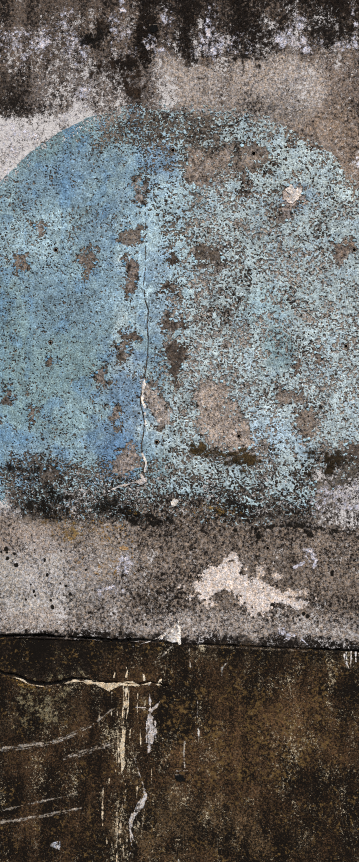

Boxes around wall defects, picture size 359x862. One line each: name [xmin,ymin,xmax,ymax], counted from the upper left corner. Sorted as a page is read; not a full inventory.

water stain [1,0,359,124]
peeling [185,139,272,194]
peeling [75,247,98,275]
peeling [118,224,145,295]
peeling [193,378,257,453]
water stain [3,462,73,520]
water stain [88,453,197,532]
water stain [223,455,258,474]
water stain [306,448,358,498]
spalling [177,549,317,619]
crack [0,632,359,686]